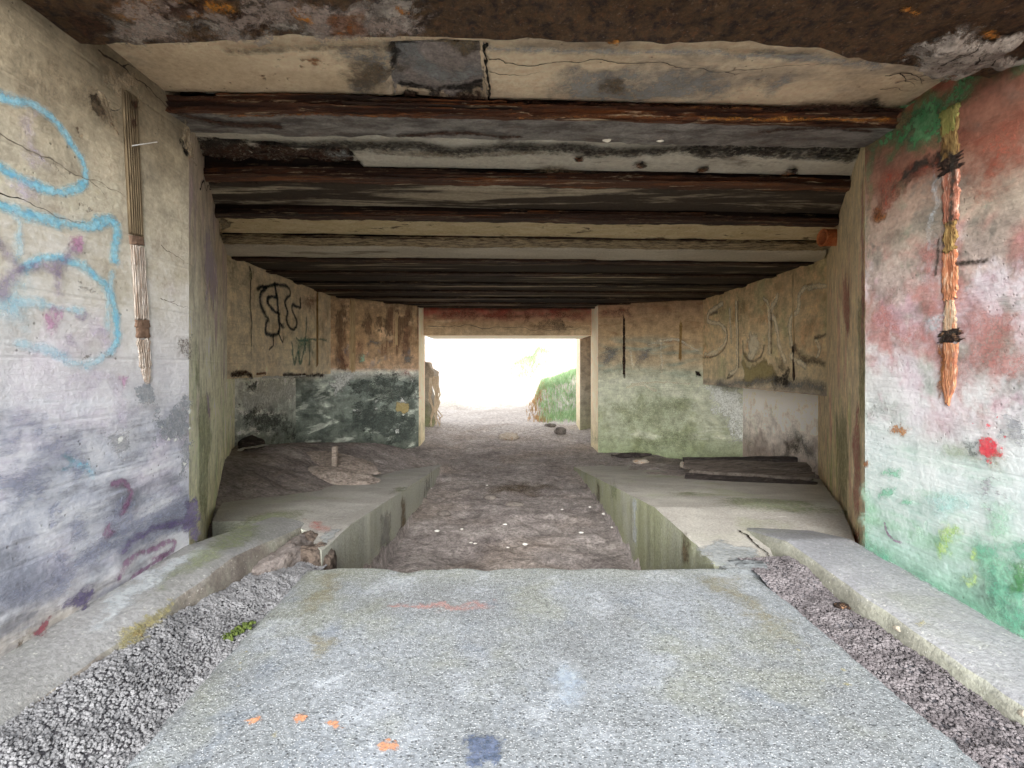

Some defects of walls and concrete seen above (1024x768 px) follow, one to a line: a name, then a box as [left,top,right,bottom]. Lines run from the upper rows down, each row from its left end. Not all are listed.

spalling [389,39,488,97]
crack [482,42,862,101]
crack [880,64,938,91]
spalling [903,26,1024,81]
crack [0,133,125,197]
crack [0,193,84,223]